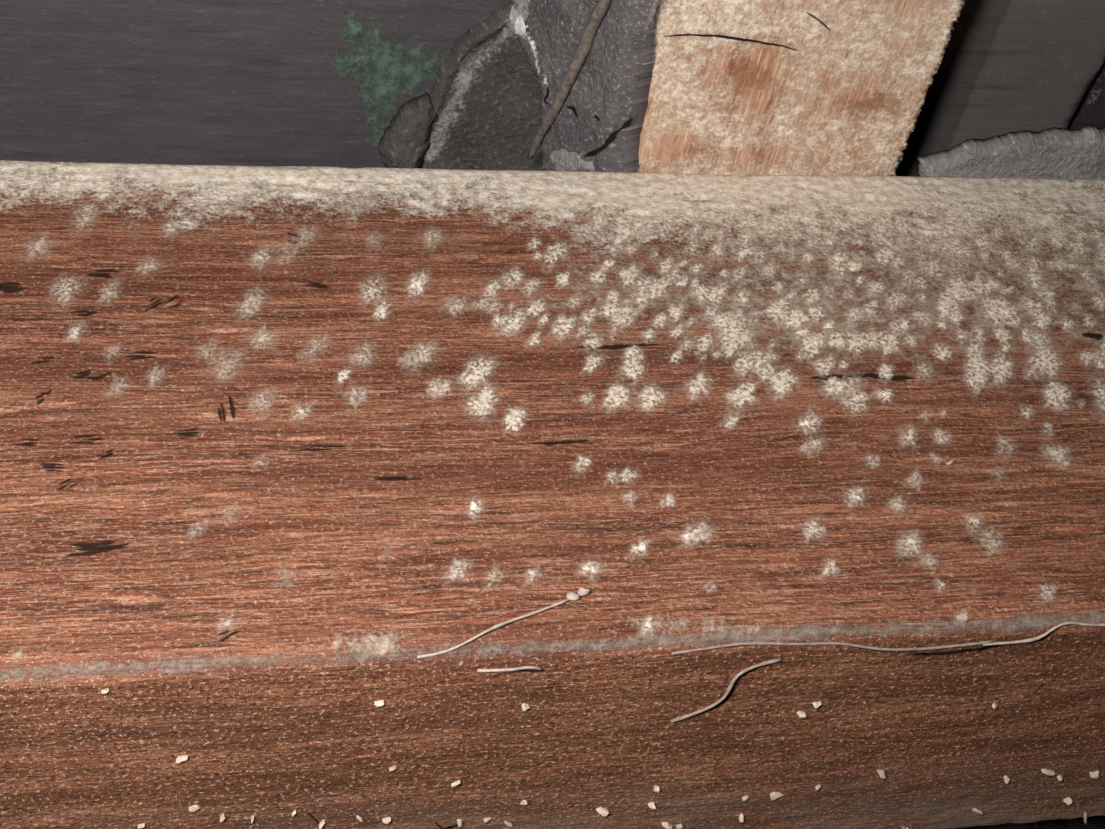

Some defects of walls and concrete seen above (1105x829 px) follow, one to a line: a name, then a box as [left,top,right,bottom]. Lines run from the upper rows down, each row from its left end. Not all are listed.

leakage [0,0,1105,431]
leakage [798,413,821,451]
leakage [608,469,635,482]
leakage [848,488,864,504]
leakage [682,523,711,543]
leakage [804,522,824,537]
leakage [631,540,647,553]
leakage [903,534,935,565]
leakage [582,562,600,574]
leakage [334,611,1105,662]
leakage [0,654,312,682]